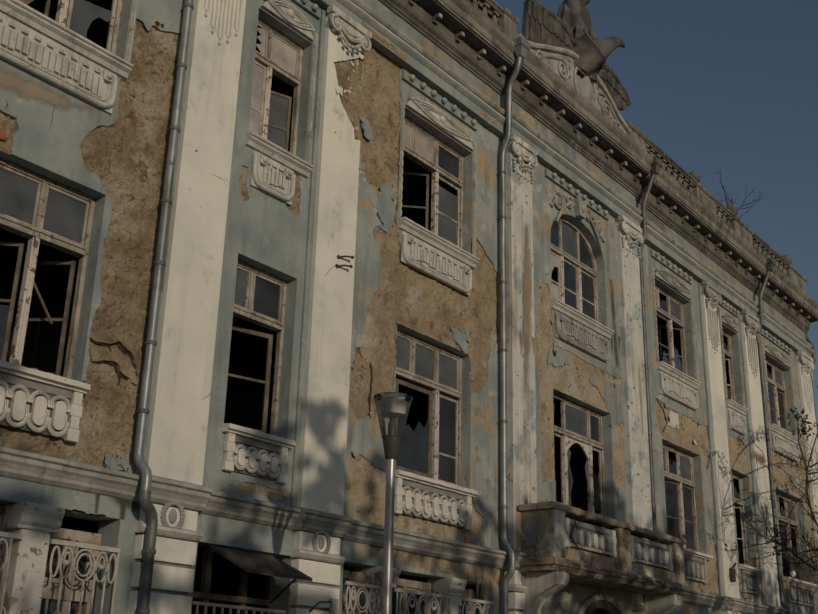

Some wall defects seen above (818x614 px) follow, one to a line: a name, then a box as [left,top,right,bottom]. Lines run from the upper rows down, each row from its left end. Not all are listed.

crack [89,325,144,387]
crack [656,398,684,433]
peeling [665,402,679,428]